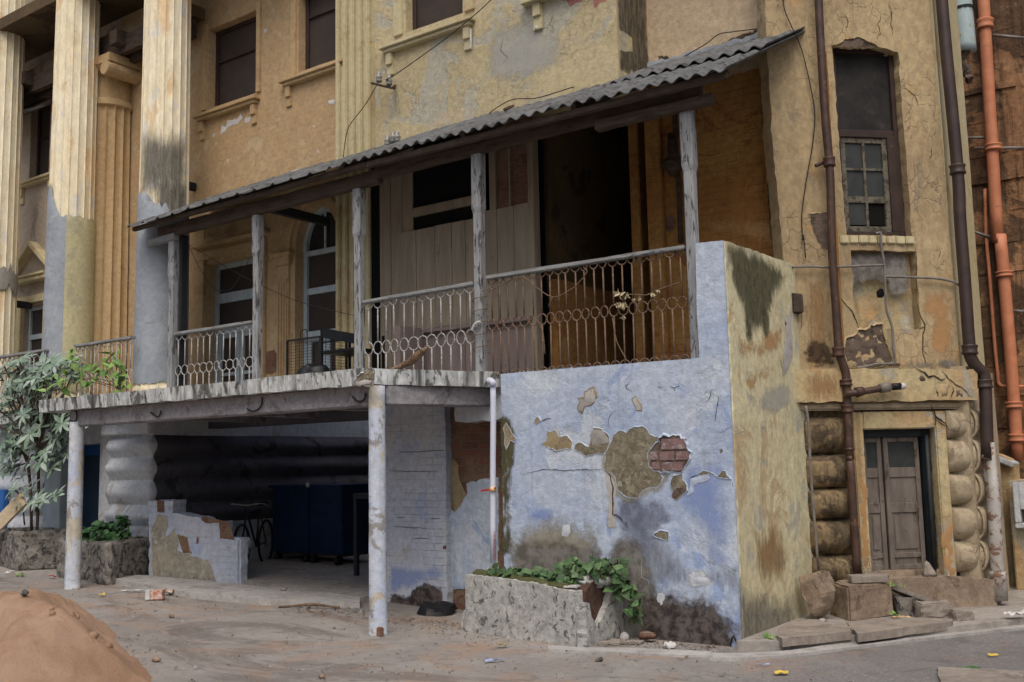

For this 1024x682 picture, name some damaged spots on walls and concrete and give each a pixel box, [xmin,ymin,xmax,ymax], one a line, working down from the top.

peeling [213,113,251,137]
water stain [729,247,783,354]
flaking render [844,322,893,369]
crack [915,249,972,430]
flaking render [577,387,597,414]
flaking render [503,423,517,450]
flaking render [534,415,732,501]
flaking render [150,500,217,582]
flaking render [201,516,235,540]
crack [520,469,628,528]
water stain [499,416,794,647]